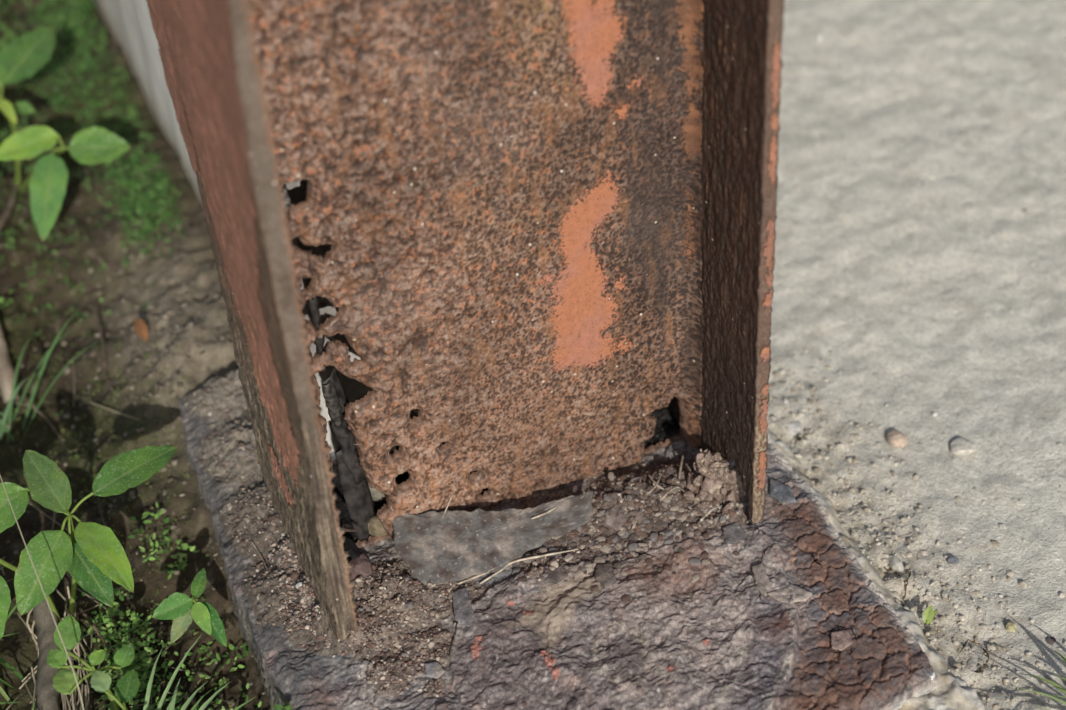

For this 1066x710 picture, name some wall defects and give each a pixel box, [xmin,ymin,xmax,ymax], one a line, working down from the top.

corrosion [281,177,316,224]
corrosion [291,215,414,580]
corrosion [642,395,690,457]